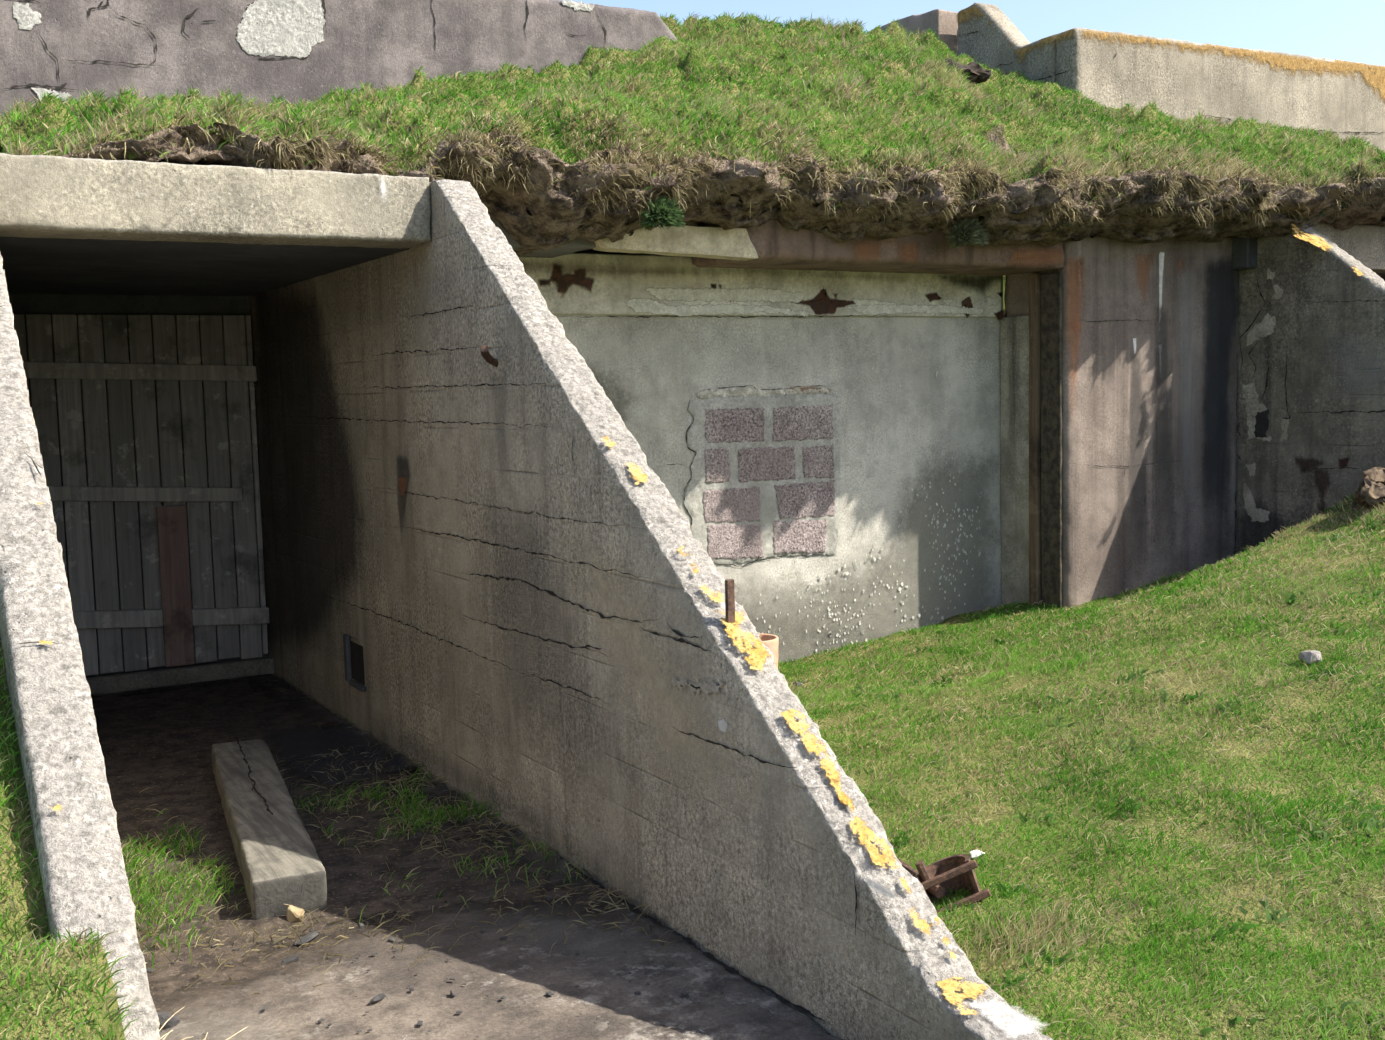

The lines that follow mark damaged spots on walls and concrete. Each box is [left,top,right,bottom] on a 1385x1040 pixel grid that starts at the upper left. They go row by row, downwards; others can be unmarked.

spalling [13,2,42,30]
crack [1,0,327,91]
spalling [235,0,326,59]
corrosion [539,264,594,293]
corrosion [691,219,1065,320]
water stain [1130,252,1170,512]
water stain [1204,260,1238,495]
spalling [1243,382,1289,442]
spalling [1243,462,1270,522]
crack [331,487,710,705]
crack [235,737,274,815]
crack [671,726,796,768]